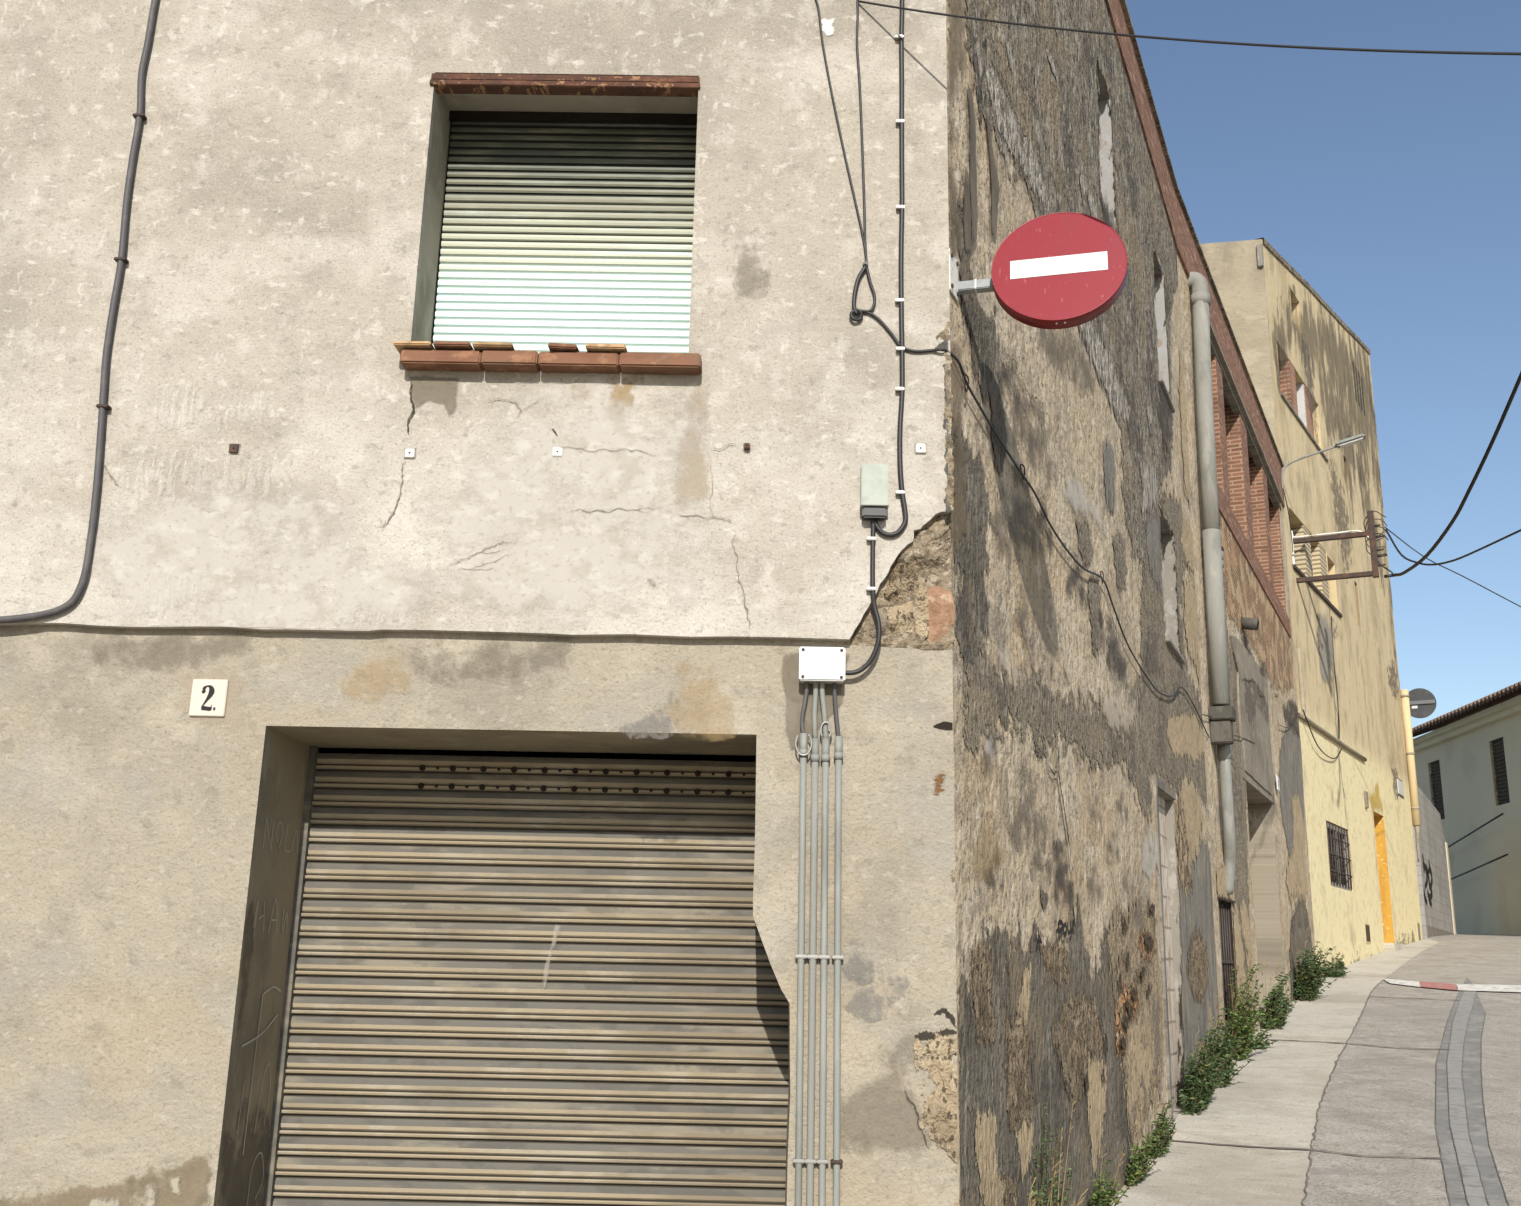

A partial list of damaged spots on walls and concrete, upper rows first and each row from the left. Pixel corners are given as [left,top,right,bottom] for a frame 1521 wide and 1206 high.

crack [376,382,415,527]
flaking render [844,0,1207,897]
flaking render [1187,919,1209,1007]
flaking render [914,886,1165,1206]
damp [0,1157,210,1206]